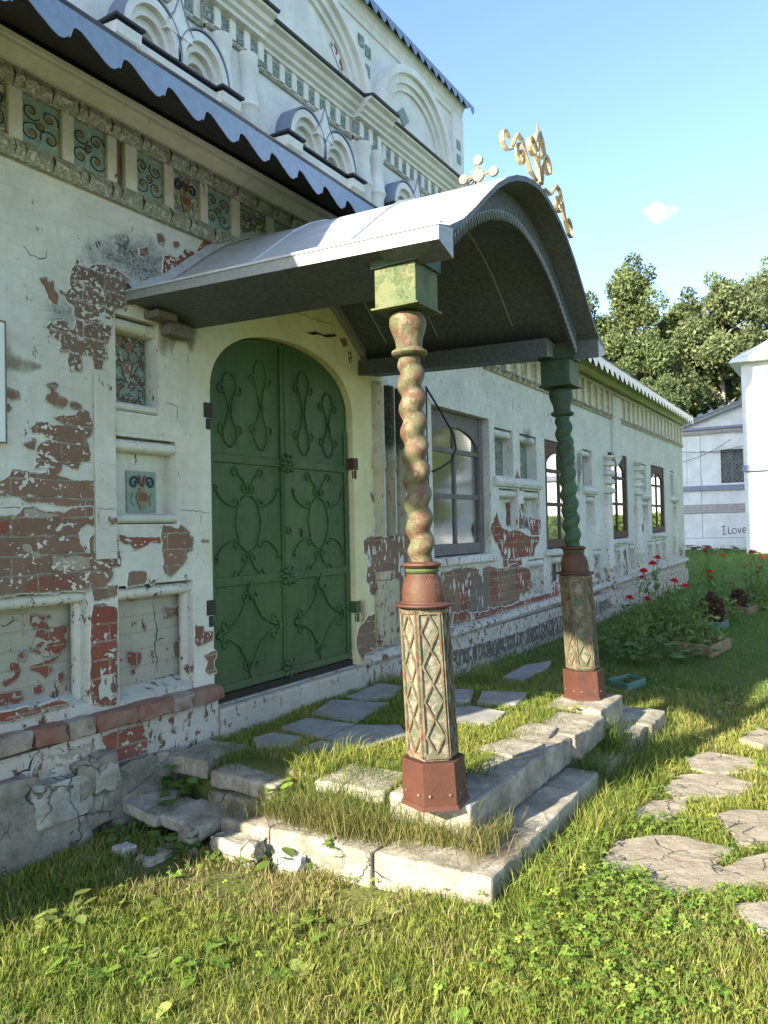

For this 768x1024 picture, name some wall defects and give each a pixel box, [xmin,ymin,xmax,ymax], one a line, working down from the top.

flaking render [37,256,144,374]
flaking render [0,381,195,707]
flaking render [363,517,410,602]
flaking render [439,470,561,627]
flaking render [0,613,71,724]
crack [14,748,65,777]
flaking render [29,721,149,794]